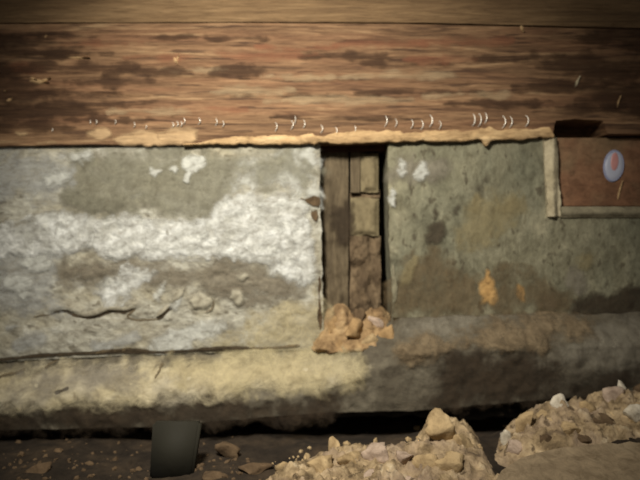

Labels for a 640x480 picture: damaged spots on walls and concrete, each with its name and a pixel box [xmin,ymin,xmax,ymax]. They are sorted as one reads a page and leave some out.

leakage [0,144,321,307]
rust [480,270,496,304]
crack [34,304,172,321]
leakage [387,208,640,410]
crack [0,344,300,378]